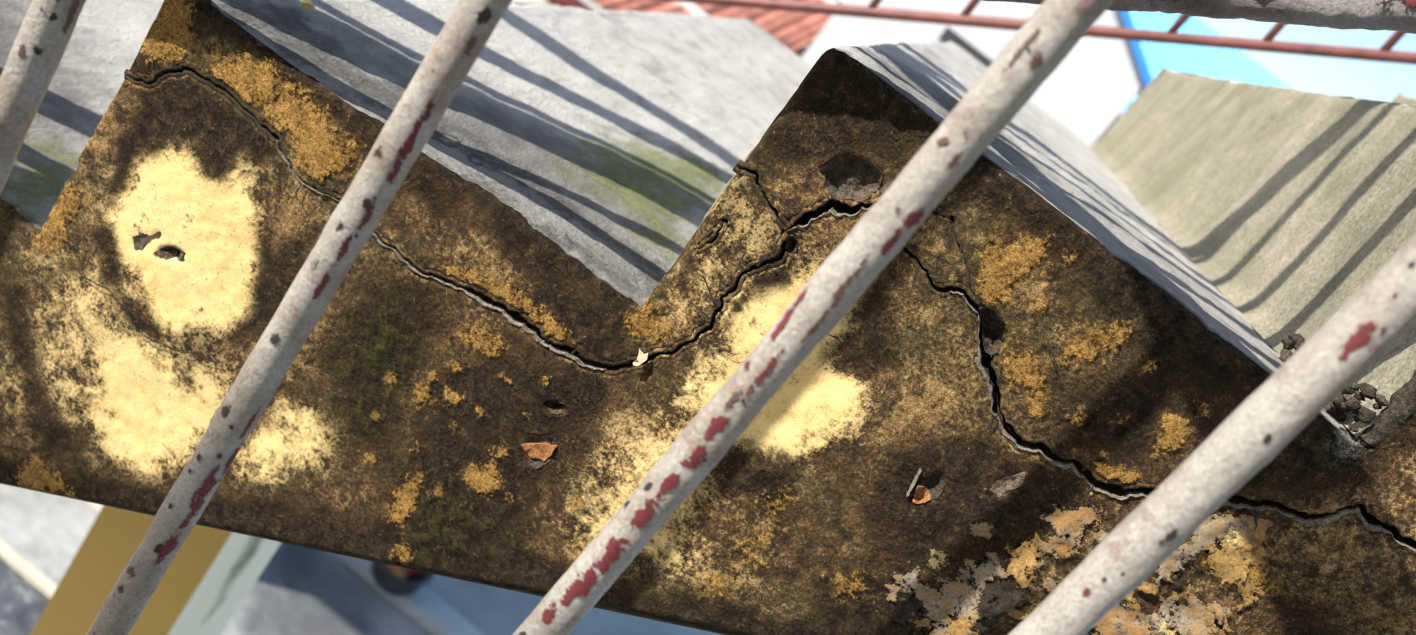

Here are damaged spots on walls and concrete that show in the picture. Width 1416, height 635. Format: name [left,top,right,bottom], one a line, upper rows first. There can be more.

crack [124,63,346,210]
damp [185,0,385,152]
damp [0,224,176,515]
crack [371,160,880,383]
crack [899,206,1160,517]
damp [959,154,1271,465]
spalling [1279,332,1306,362]
spalling [1325,370,1416,447]
damp [597,423,1100,635]
peeling [884,498,1117,635]
peeling [1085,514,1272,635]
crack [1213,491,1416,591]